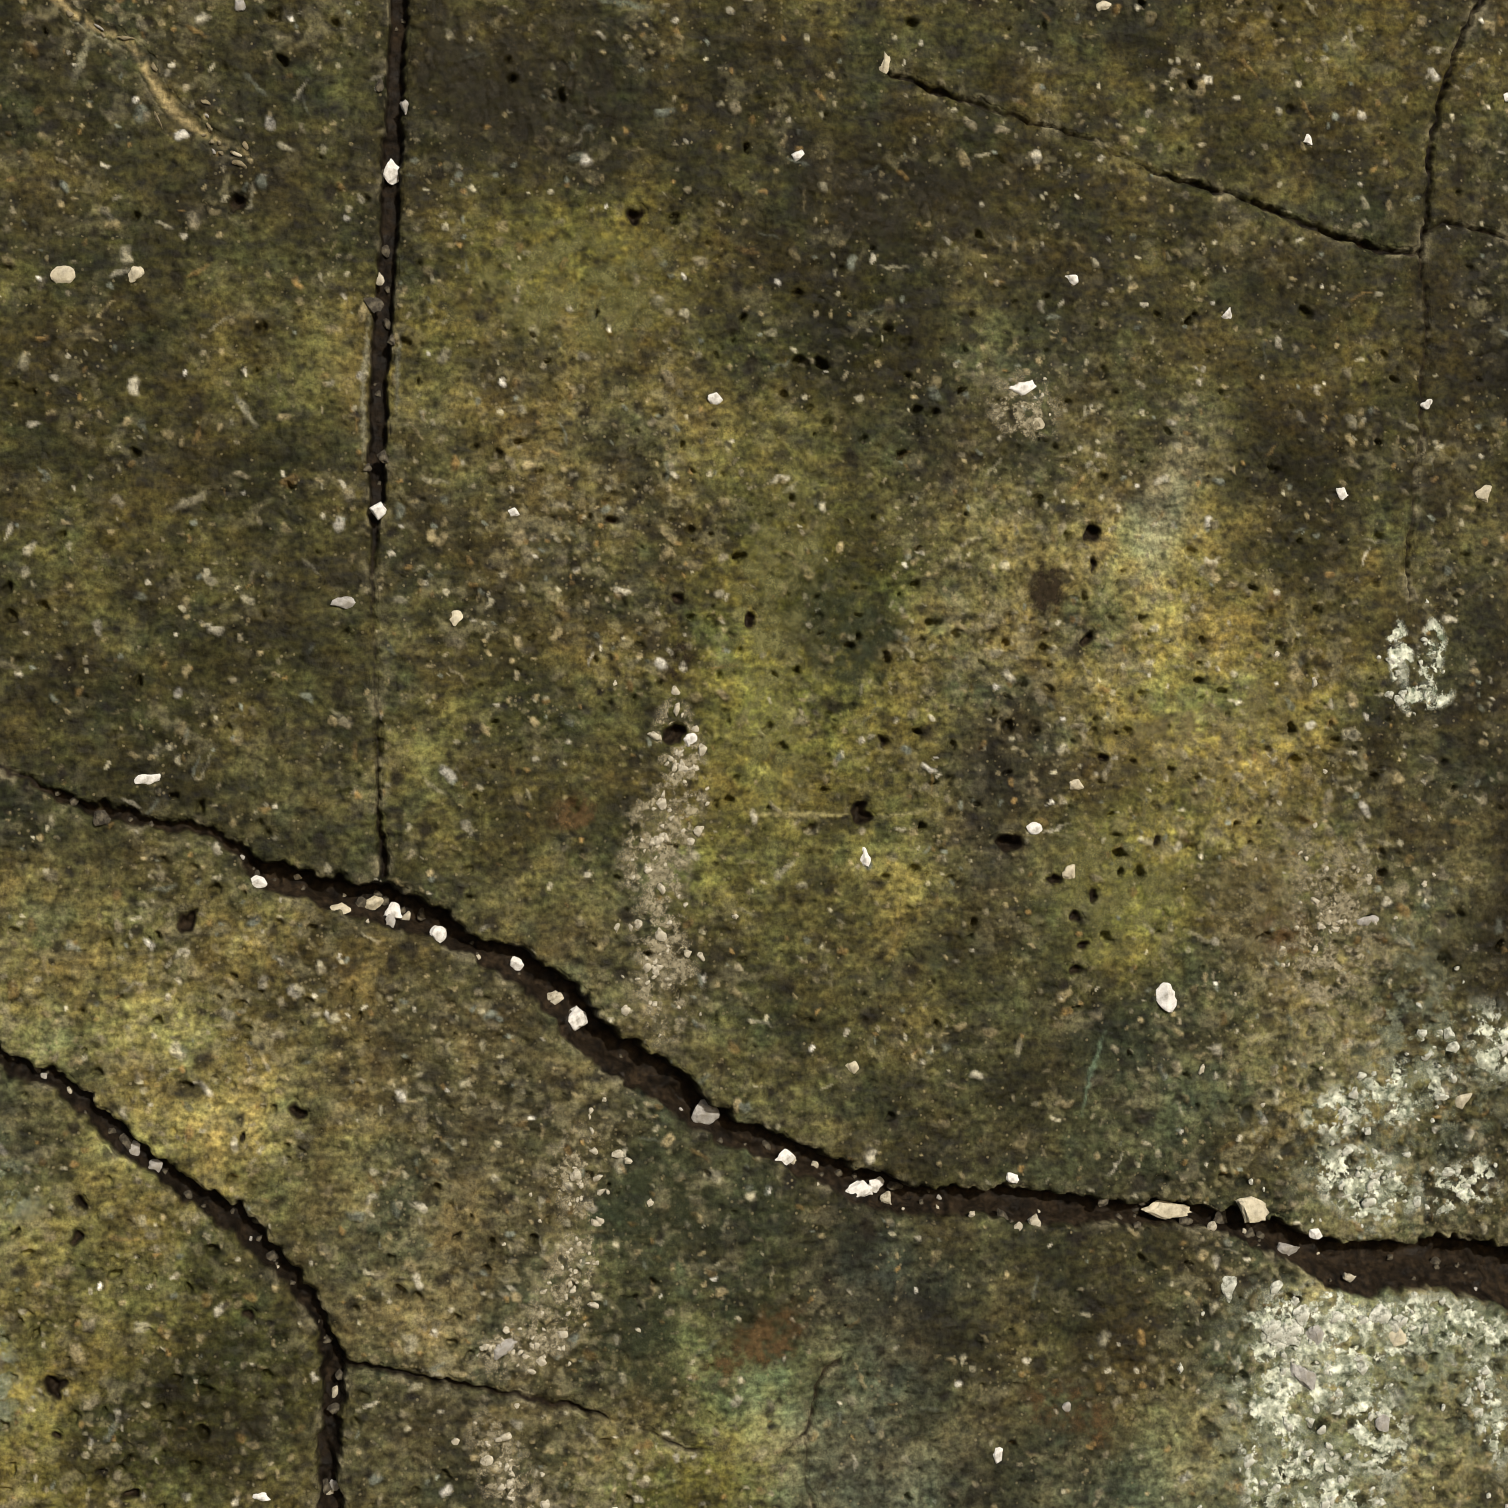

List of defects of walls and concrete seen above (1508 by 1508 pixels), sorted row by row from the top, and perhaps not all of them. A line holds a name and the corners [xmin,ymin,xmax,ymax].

crack [877,0,1508,614]
crack [362,0,413,881]
efflorescence [1377,620,1450,715]
crack [0,762,1508,1313]
water stain [1304,990,1508,1228]
crack [0,1038,716,1508]
crack [774,1348,855,1508]
water stain [1221,1276,1237,1303]
water stain [1235,1280,1508,1508]